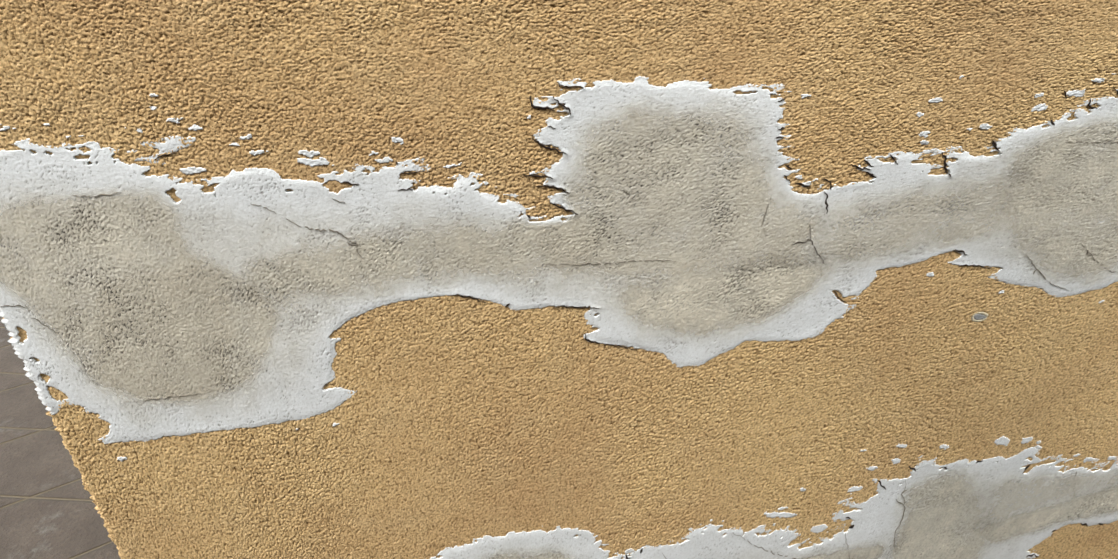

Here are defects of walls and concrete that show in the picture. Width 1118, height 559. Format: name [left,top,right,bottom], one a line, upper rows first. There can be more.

peeling [0,73,1118,444]
crack [792,193,829,263]
peeling [430,436,1118,559]